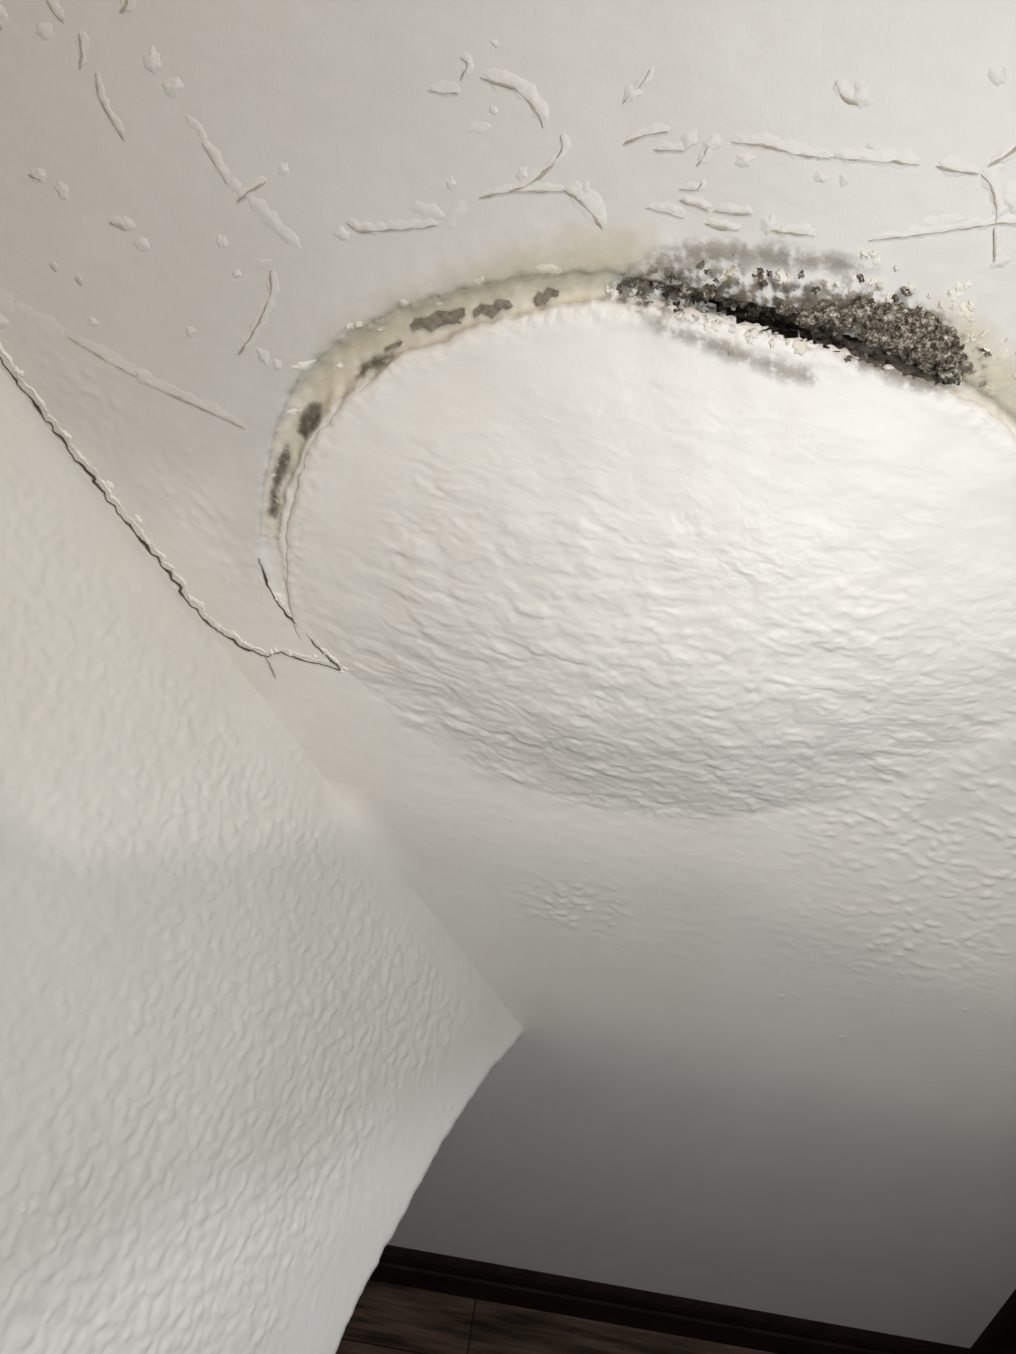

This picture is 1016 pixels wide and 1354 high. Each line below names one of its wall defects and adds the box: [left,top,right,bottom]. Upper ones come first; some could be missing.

spalling [716,251,759,290]
spalling [775,266,786,282]
damp [360,356,389,375]
spalling [727,327,808,356]
damp [604,260,992,387]
spalling [821,249,1016,417]
damp [299,404,320,437]
peeling [260,264,614,540]
crack [0,343,348,679]
damp [270,450,290,517]